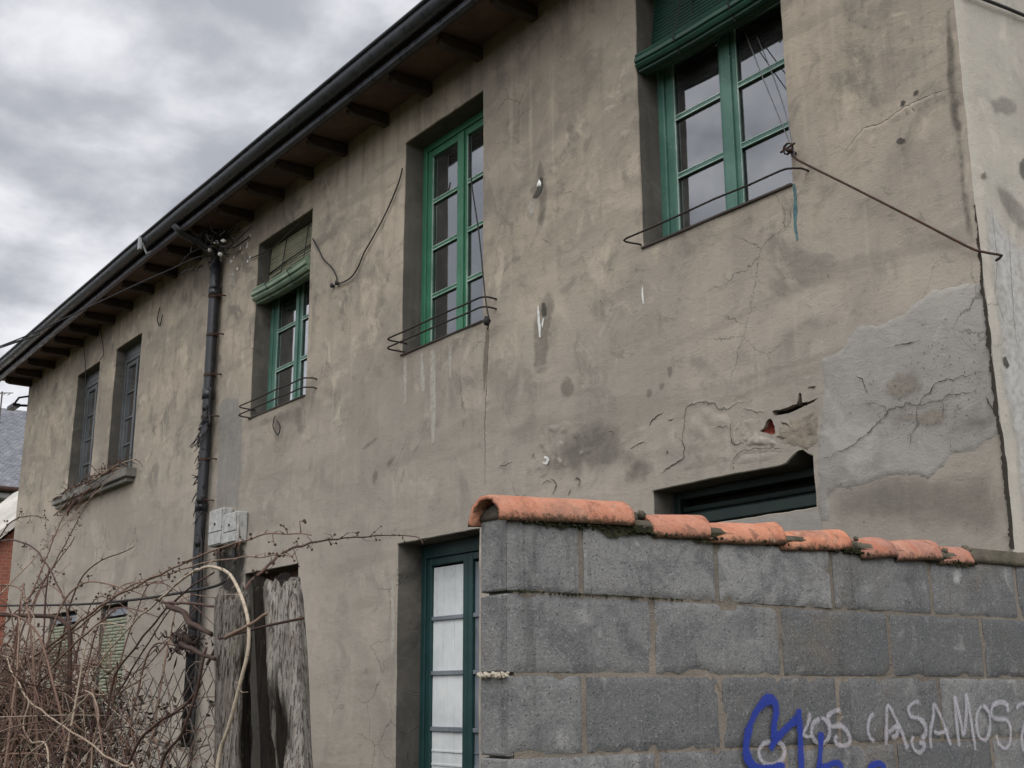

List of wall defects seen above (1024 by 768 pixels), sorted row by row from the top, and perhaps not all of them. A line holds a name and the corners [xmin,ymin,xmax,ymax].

efflorescence [421,351,436,442]
crack [608,391,790,474]
spalling [760,393,818,435]
crack [817,205,1021,549]